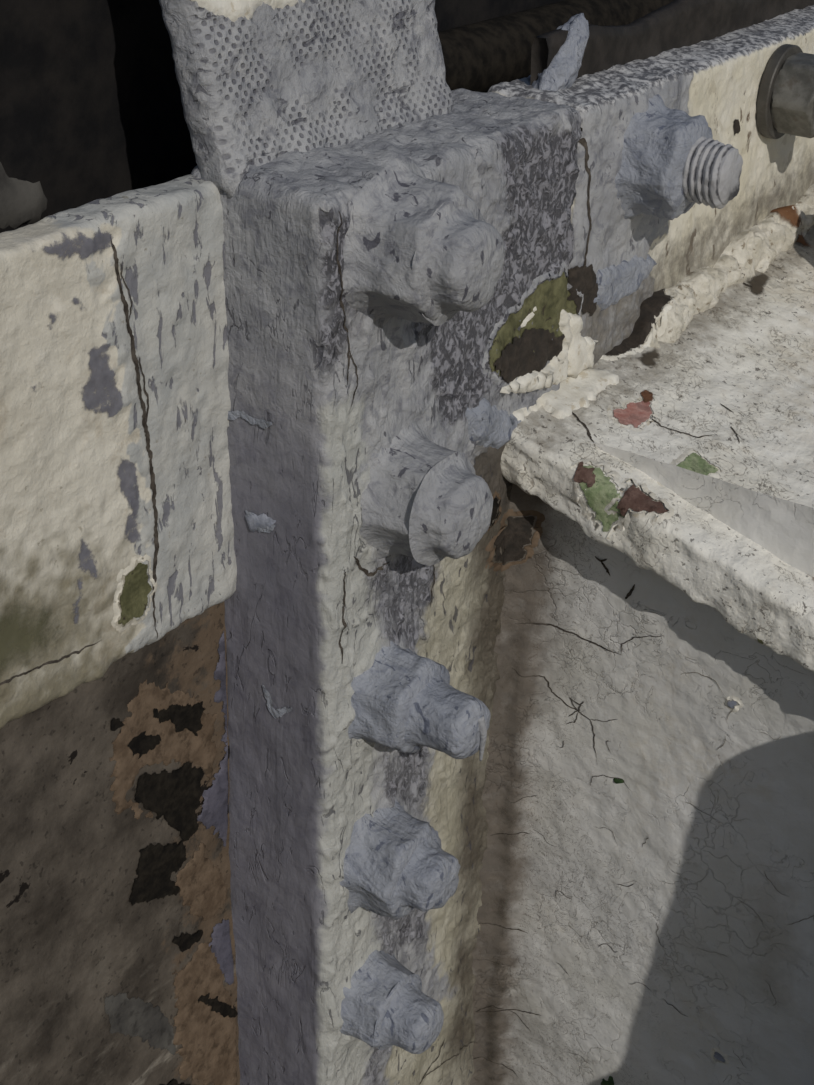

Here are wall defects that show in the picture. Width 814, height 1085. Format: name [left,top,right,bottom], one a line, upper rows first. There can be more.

peeling [482,262,676,421]
crack [110,234,159,638]
peeling [607,390,658,432]
peeling [111,554,158,633]
crack [595,556,635,599]
crack [0,640,101,685]
crack [515,622,661,655]
peeling [128,701,206,759]
crack [515,670,630,790]
crack [682,672,733,750]
peeling [129,761,205,905]
peeling [198,993,238,1018]